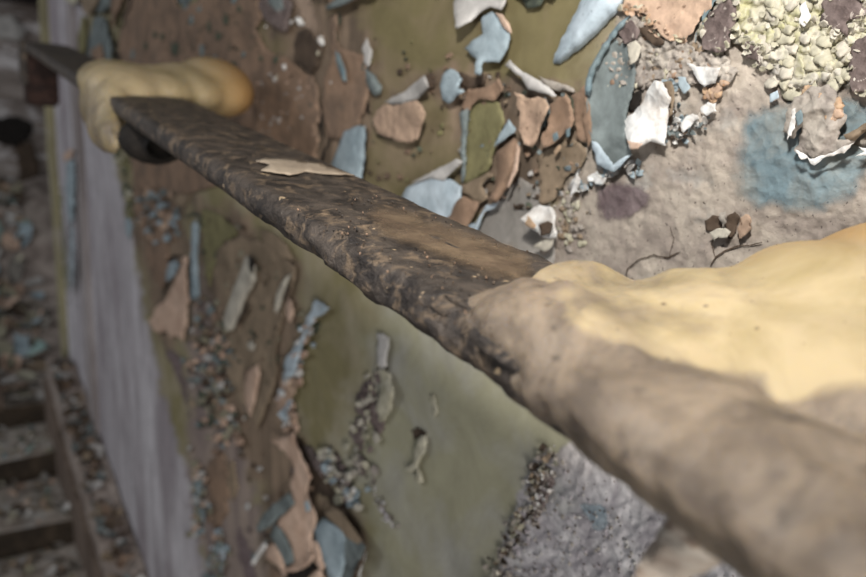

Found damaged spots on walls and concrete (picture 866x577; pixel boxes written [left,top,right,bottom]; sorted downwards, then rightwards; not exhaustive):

peeling [67,0,766,263]
peeling [783,84,866,166]
spalling [818,0,866,97]
peeling [214,236,394,577]